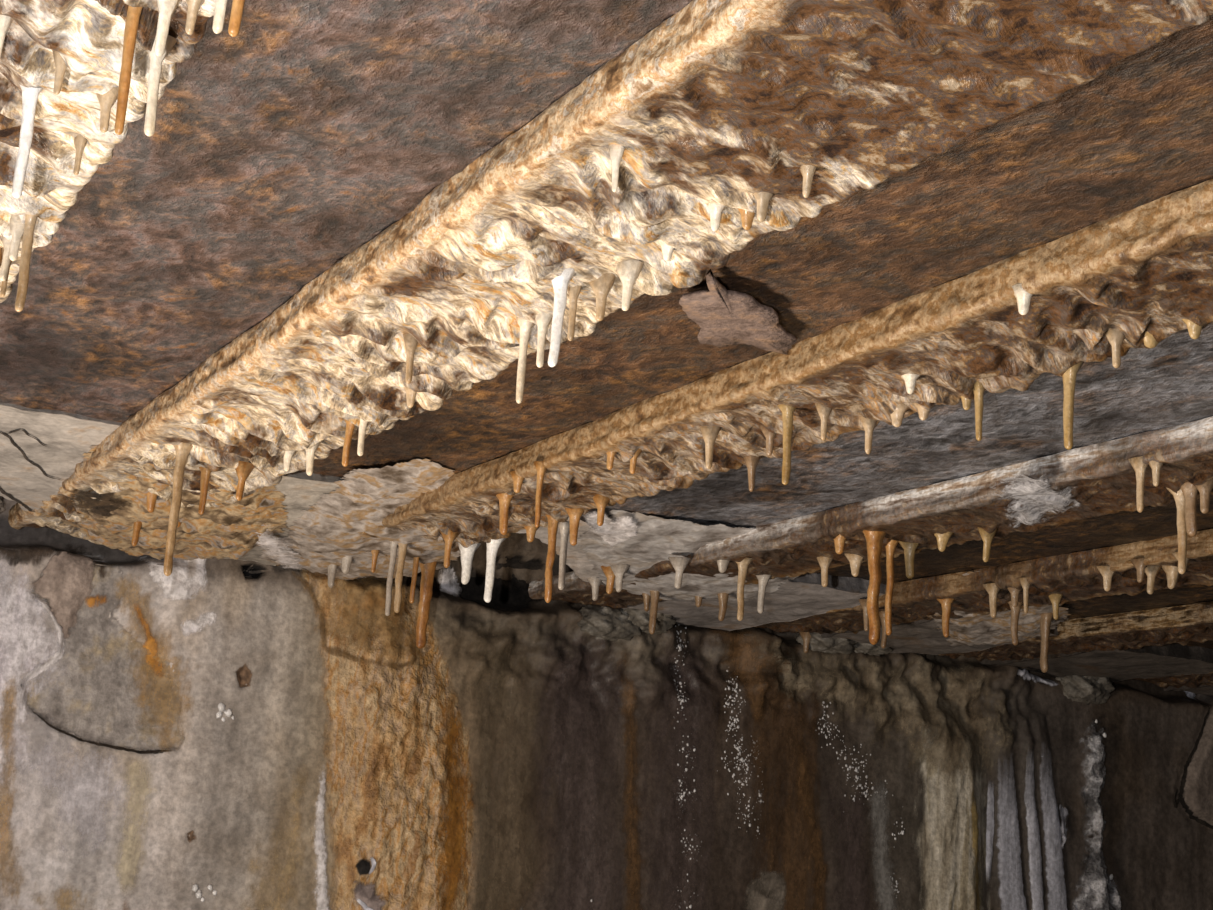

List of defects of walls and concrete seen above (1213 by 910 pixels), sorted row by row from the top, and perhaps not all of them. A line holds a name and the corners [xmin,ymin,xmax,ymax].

leakage [0,0,1213,552]
crack [0,488,34,512]
crack [0,429,60,480]
spalling [459,557,543,612]
leakage [528,416,1213,609]
leakage [878,529,1213,625]
leakage [472,631,623,910]
leakage [644,641,718,910]
leakage [752,601,1213,910]